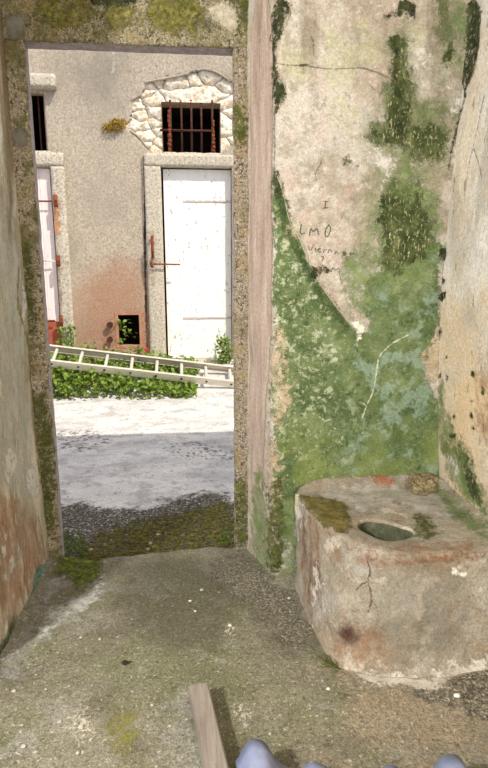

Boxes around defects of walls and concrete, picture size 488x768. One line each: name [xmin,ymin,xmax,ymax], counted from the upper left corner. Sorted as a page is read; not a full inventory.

crack [275,36,395,81]
water stain [271,182,350,330]
crack [355,561,378,612]